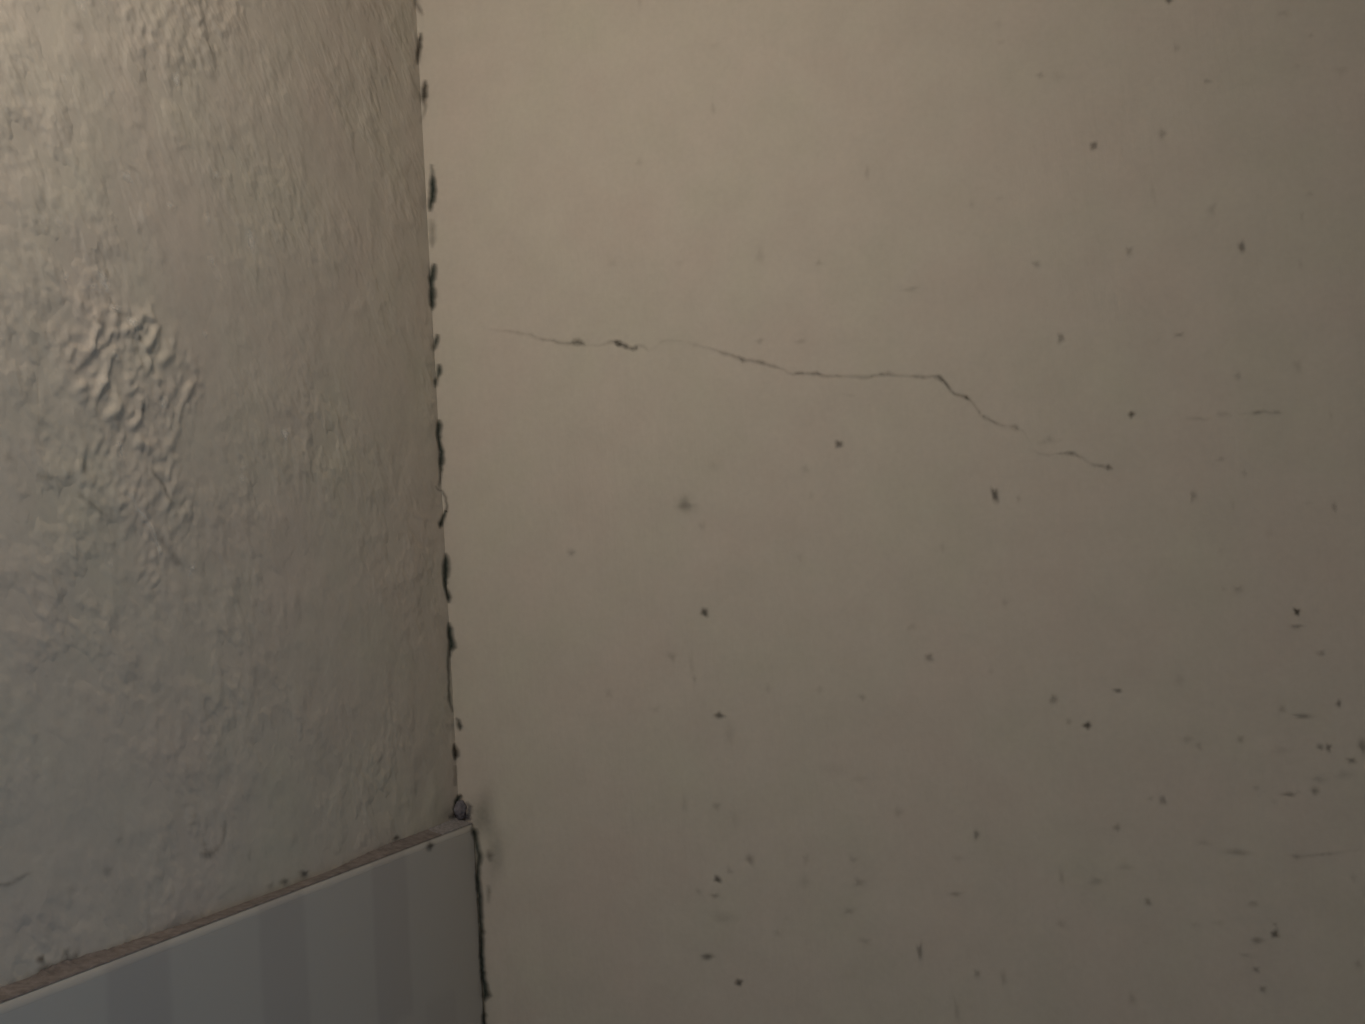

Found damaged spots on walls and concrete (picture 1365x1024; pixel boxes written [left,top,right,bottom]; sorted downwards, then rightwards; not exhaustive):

crack [417,36,426,100]
crack [428,176,436,208]
crack [429,266,441,384]
crack [436,422,444,474]
crack [439,511,454,655]